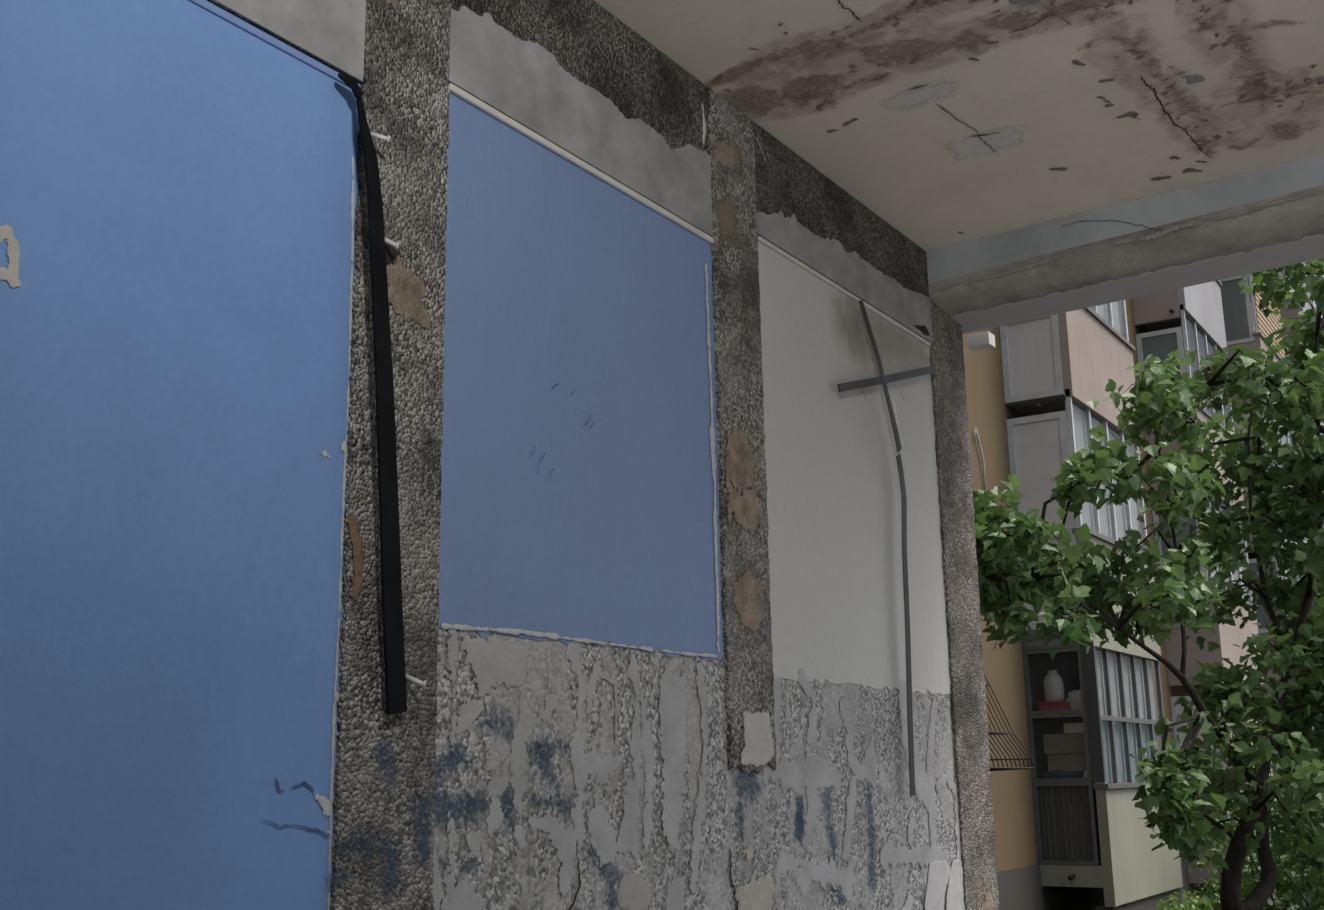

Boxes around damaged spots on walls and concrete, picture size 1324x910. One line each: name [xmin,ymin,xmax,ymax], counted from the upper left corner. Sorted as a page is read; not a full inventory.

water stain [707,0,1133,116]
spalling [1098,79,1140,120]
crack [1141,76,1214,159]
water stain [1112,0,1322,153]
spalling [1151,157,1207,181]
peeling [0,224,21,288]
spalling [442,263,764,658]
crack [262,777,329,837]